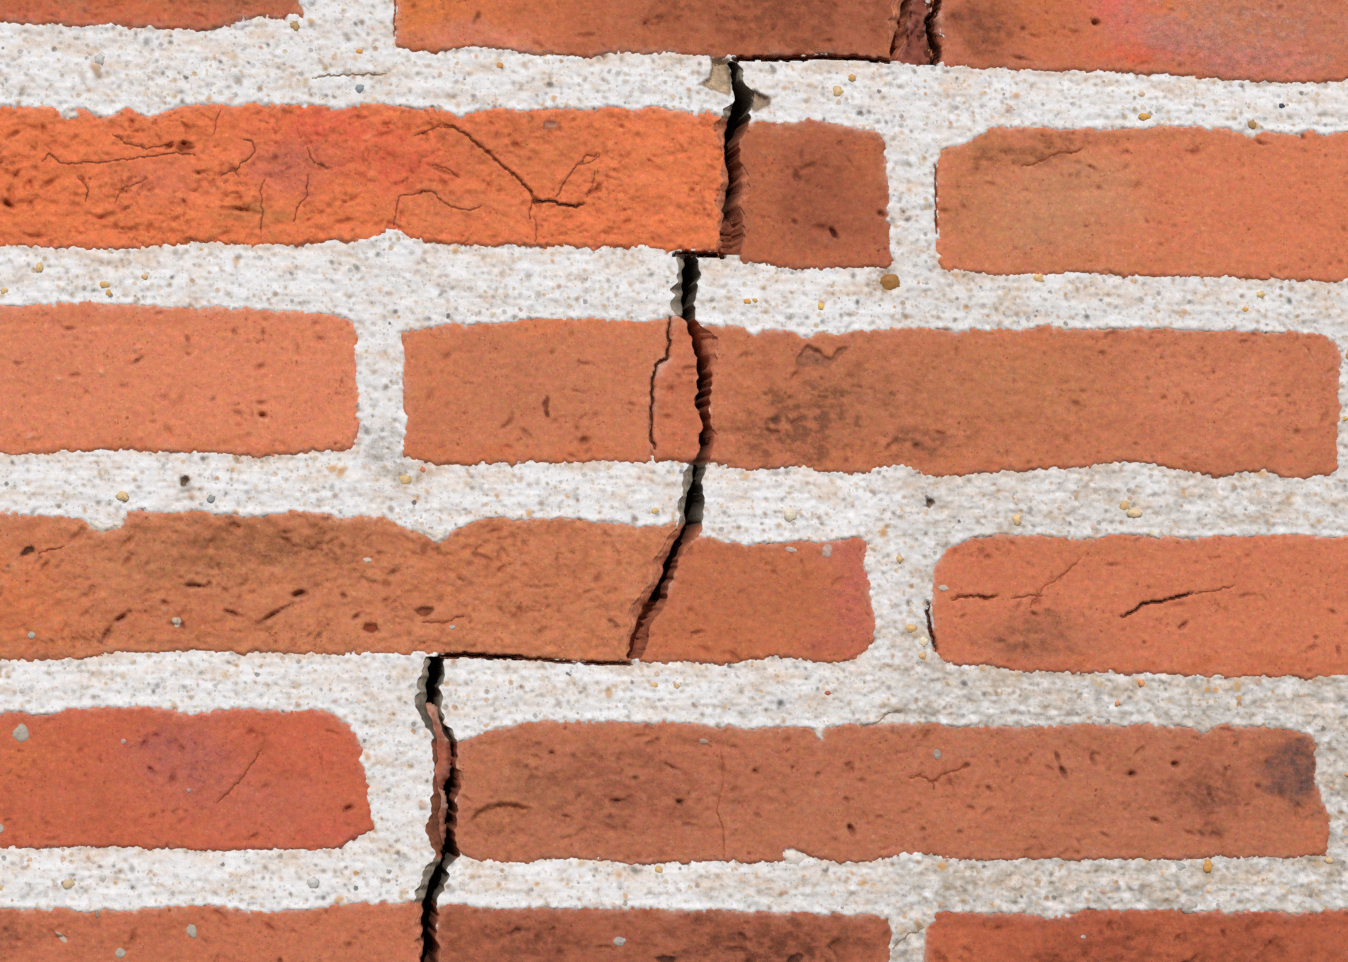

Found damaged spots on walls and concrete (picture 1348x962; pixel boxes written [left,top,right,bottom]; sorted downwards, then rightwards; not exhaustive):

crack [312,71,387,79]
crack [393,164,481,224]
crack [414,0,942,962]
crack [909,765,970,789]